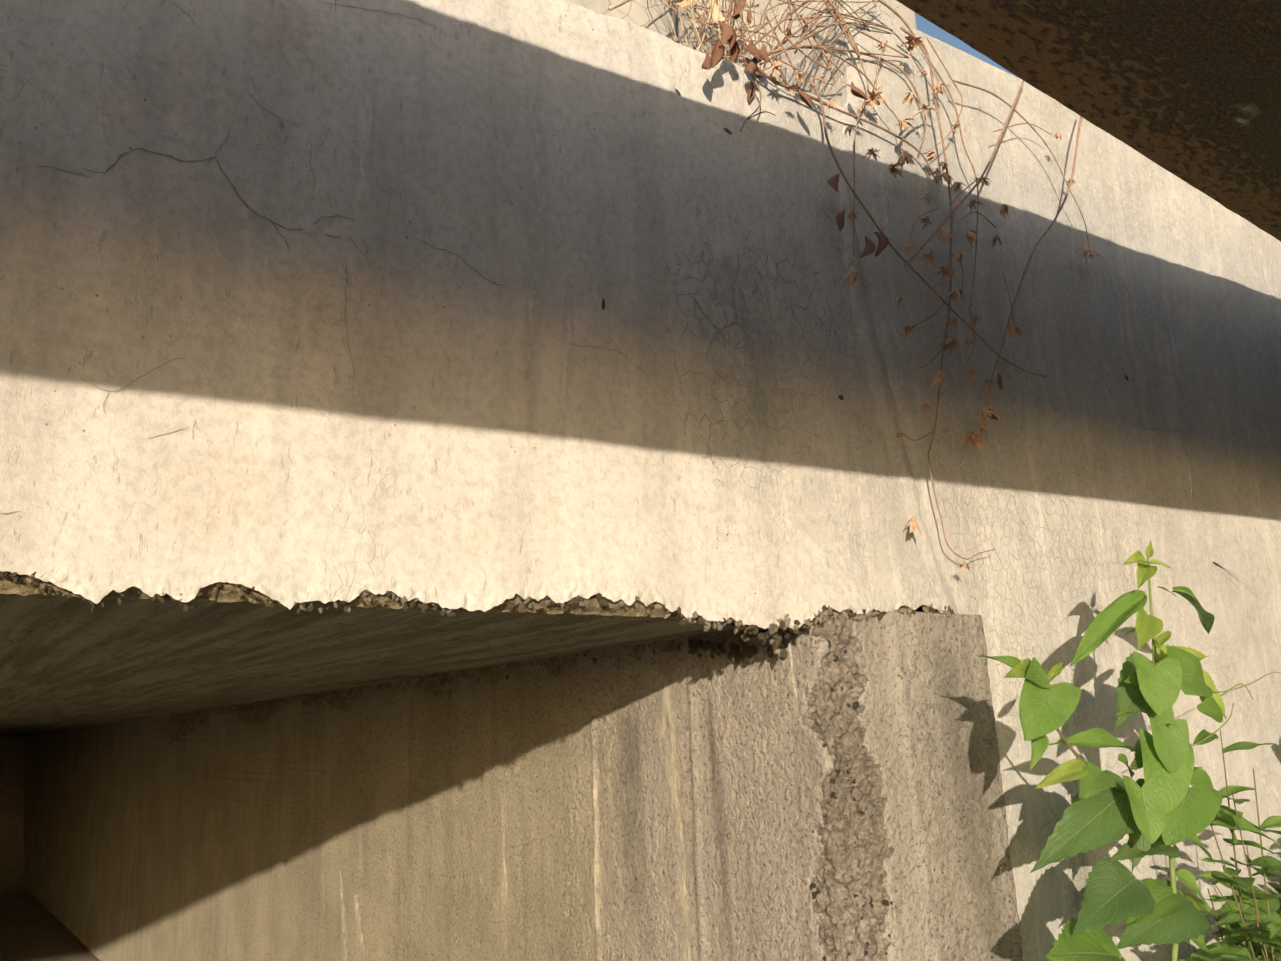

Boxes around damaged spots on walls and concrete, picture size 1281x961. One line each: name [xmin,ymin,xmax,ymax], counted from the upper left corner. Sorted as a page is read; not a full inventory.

crack [41,91,372,400]
crack [558,230,835,490]
flaking render [0,571,277,613]
flaking render [292,590,461,617]
water stain [657,675,691,961]
spalling [490,593,954,961]